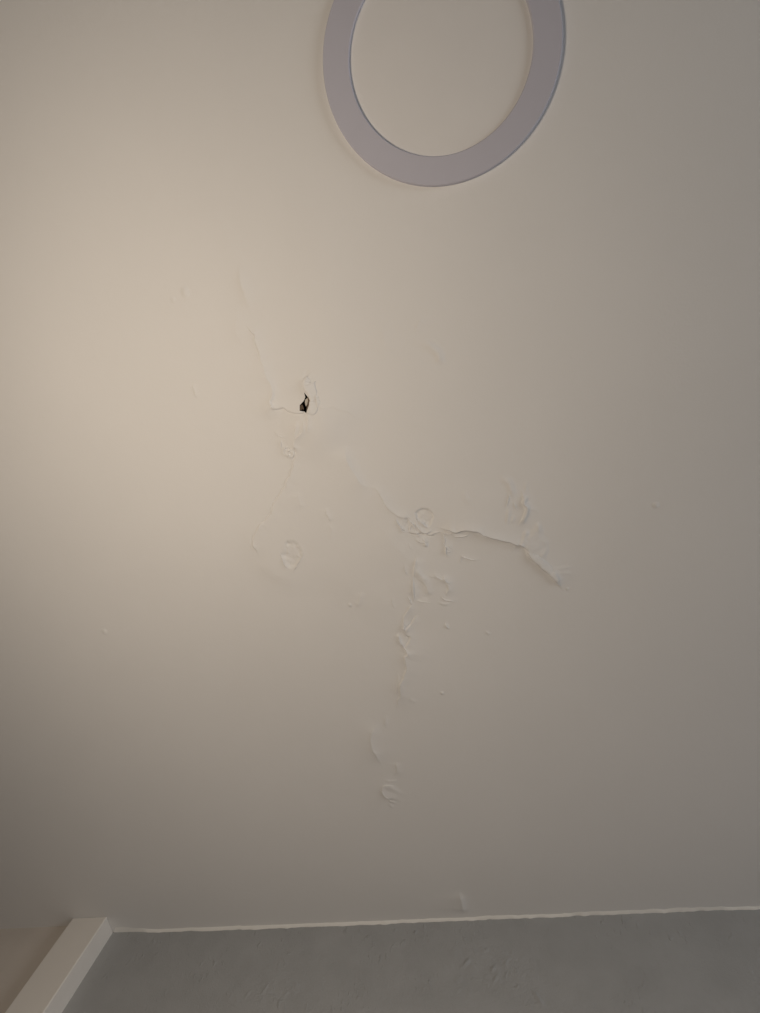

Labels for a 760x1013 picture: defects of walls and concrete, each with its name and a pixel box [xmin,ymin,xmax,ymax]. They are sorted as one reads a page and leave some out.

crack [246,318,305,427]